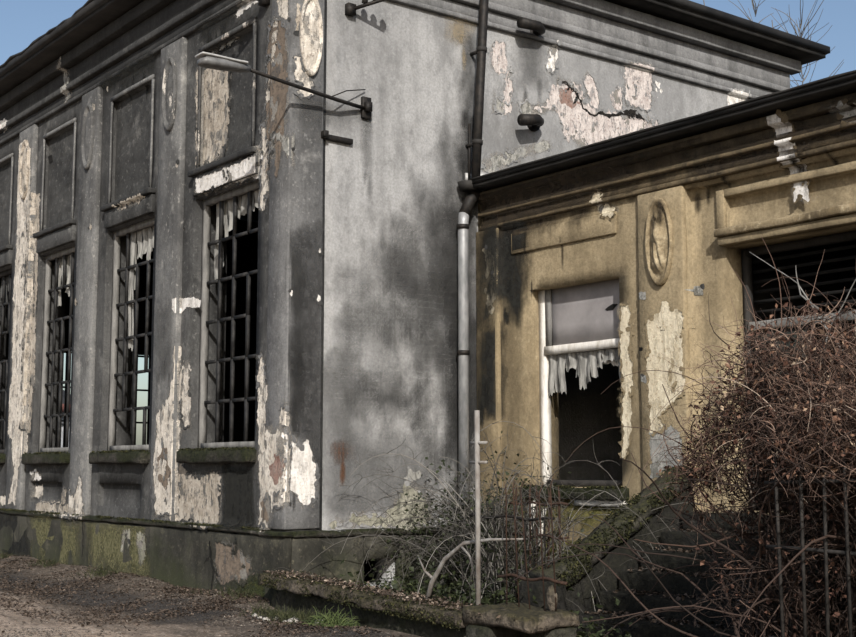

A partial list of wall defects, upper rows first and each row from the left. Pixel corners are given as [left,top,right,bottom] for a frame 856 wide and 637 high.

flaking render [194,0,315,211]
flaking render [481,140,551,173]
flaking render [488,38,663,147]
crack [558,80,645,122]
flaking render [765,109,810,204]
flaking render [0,142,90,521]
flaking render [151,343,222,532]
flaking render [256,353,321,532]
water stain [476,139,690,424]
flaking render [618,301,697,479]
water stain [0,514,30,557]
flaking render [214,540,252,590]